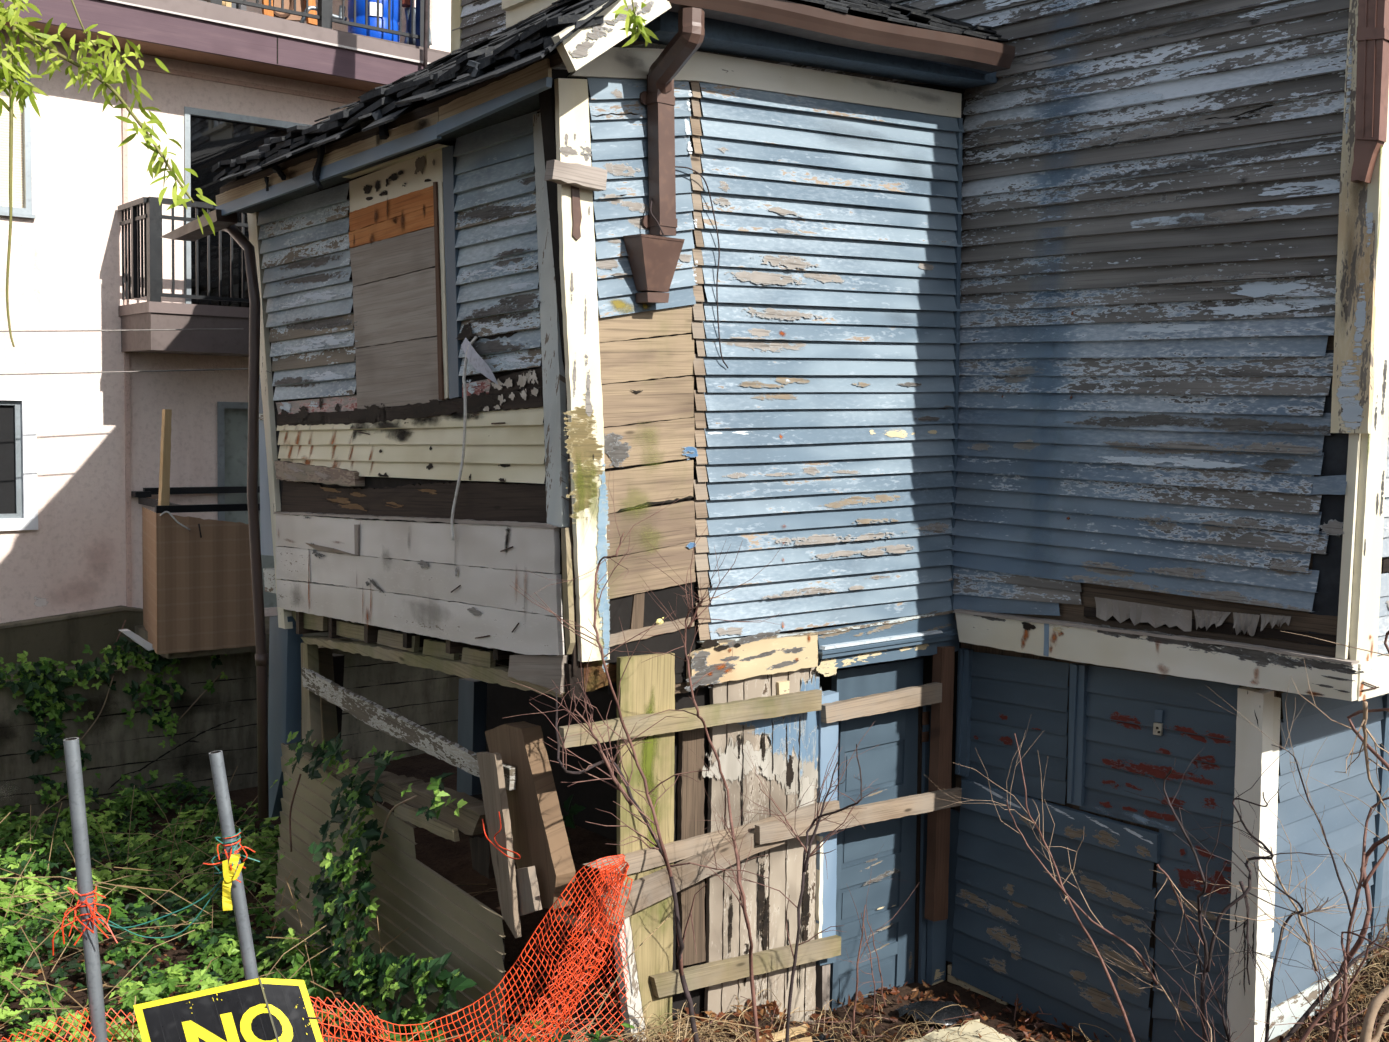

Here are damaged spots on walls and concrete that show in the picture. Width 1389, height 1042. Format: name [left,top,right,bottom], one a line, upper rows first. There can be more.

peeling [1070,34,1353,230]
peeling [456,248,541,412]
peeling [703,307,823,352]
peeling [725,255,845,285]
peeling [1124,271,1335,334]
peeling [1064,283,1387,478]
peeling [870,405,952,438]
peeling [774,494,949,559]
peeling [1376,471,1389,530]
peeling [1065,554,1312,612]
peeling [685,611,952,808]
peeling [1056,845,1232,937]